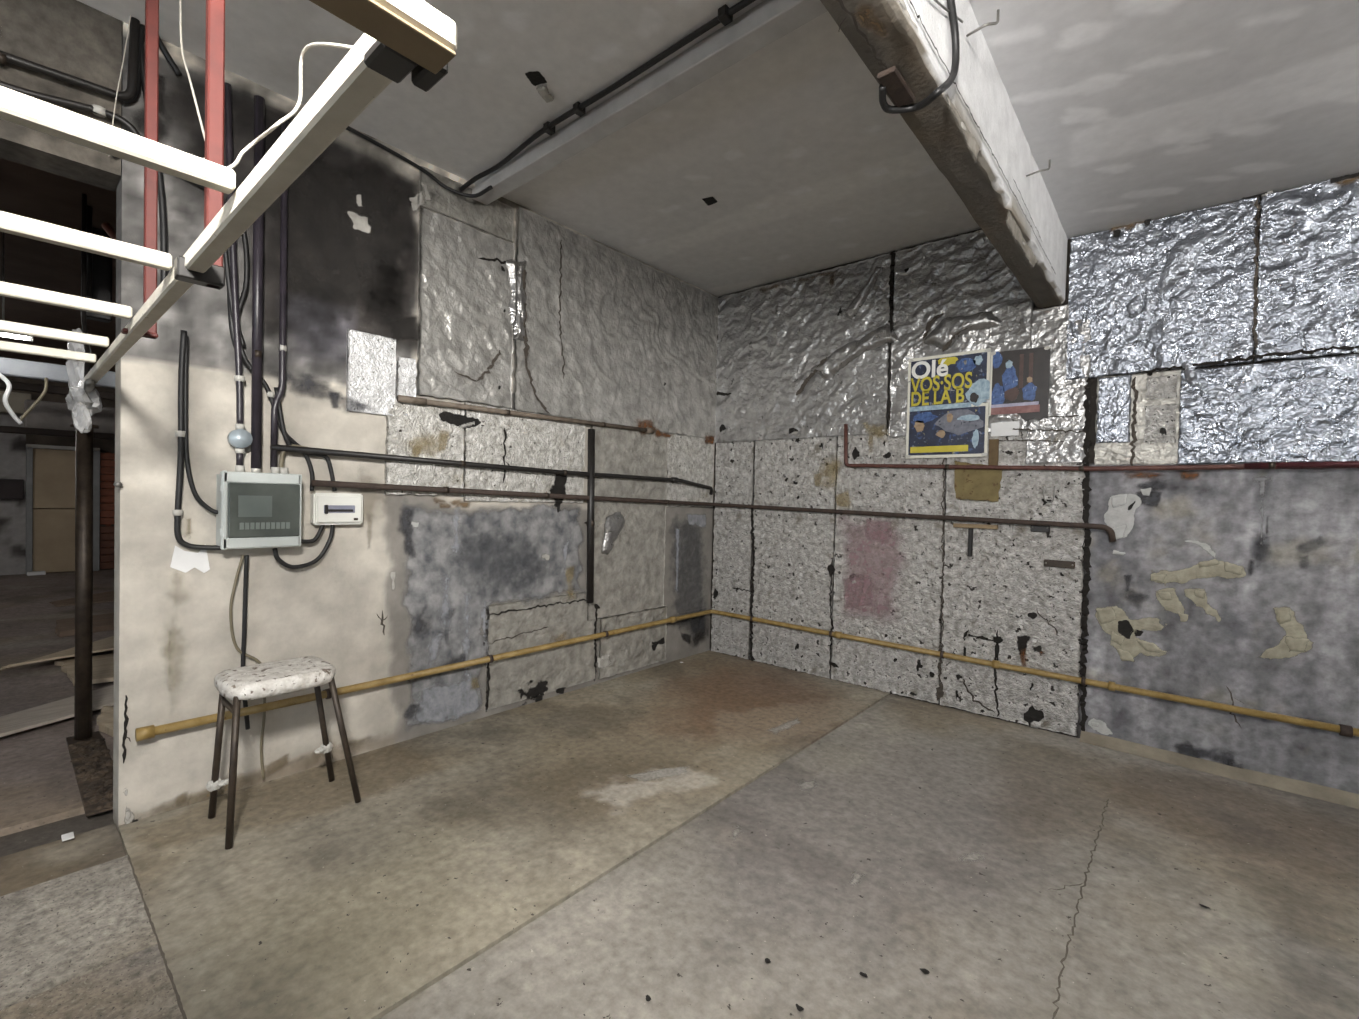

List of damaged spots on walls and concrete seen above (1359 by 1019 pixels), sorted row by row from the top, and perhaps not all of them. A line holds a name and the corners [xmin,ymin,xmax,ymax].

crack [456,240,565,414]
peeling [1104,488,1151,555]
peeling [1095,549,1246,662]
peeling [1259,607,1313,659]
crack [1052,799,1109,1019]